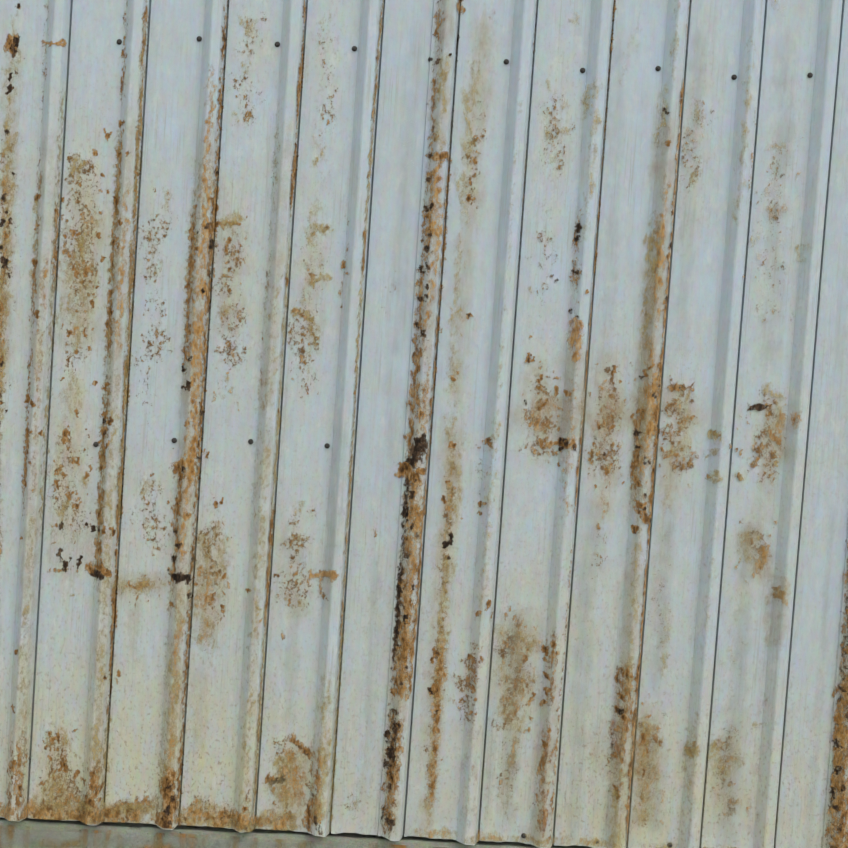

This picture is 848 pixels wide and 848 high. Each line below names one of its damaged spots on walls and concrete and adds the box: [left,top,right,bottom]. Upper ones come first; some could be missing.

corrosion [362,0,384,271]
corrosion [0,0,348,848]
corrosion [347,323,361,522]
corrosion [381,1,487,834]
corrosion [519,80,716,846]
corrosion [708,385,800,482]
corrosion [738,531,772,578]
corrosion [772,586,788,605]
corrosion [491,607,566,846]
corrosion [684,728,744,796]
corrosion [824,594,848,848]